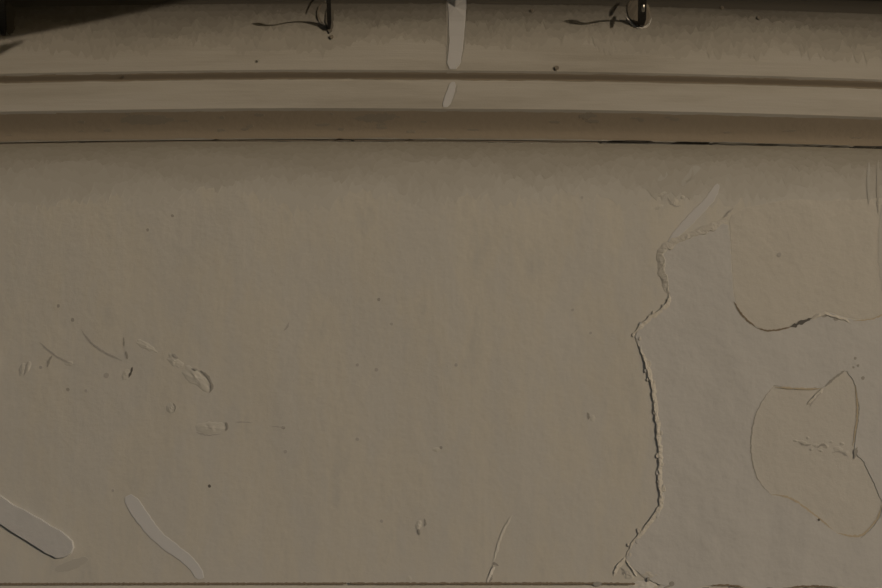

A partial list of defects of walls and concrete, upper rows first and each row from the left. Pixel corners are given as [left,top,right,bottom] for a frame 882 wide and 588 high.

spalling [613,220,728,581]